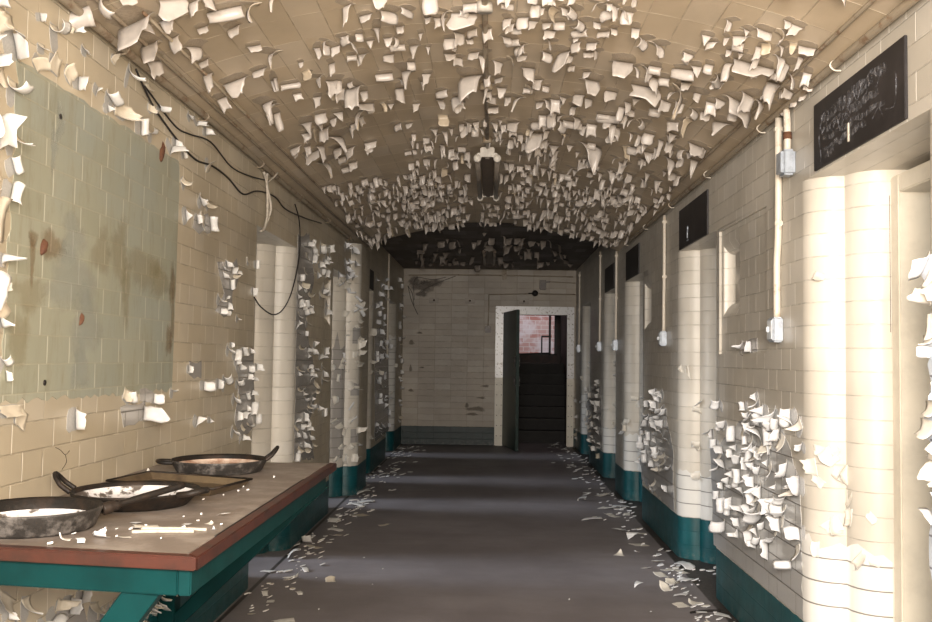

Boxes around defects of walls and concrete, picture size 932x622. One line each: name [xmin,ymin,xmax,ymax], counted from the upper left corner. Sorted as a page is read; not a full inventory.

peeling [0,0,818,465]
peeling [0,589,121,622]
peeling [143,595,178,622]
peeling [572,362,893,622]
peeling [907,250,932,497]
peeling [918,508,932,578]